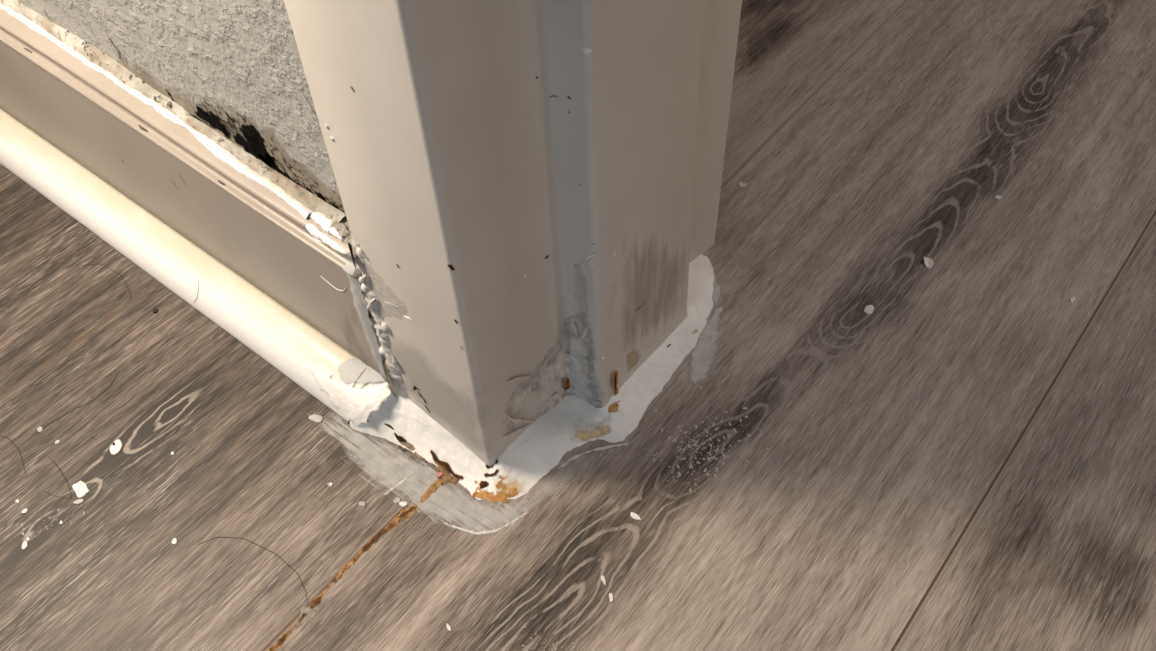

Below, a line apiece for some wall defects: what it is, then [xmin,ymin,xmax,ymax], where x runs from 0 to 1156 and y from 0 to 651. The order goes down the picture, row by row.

leakage [123,61,345,213]
rust [608,371,620,413]
spalling [394,432,463,486]
rust [472,460,521,503]